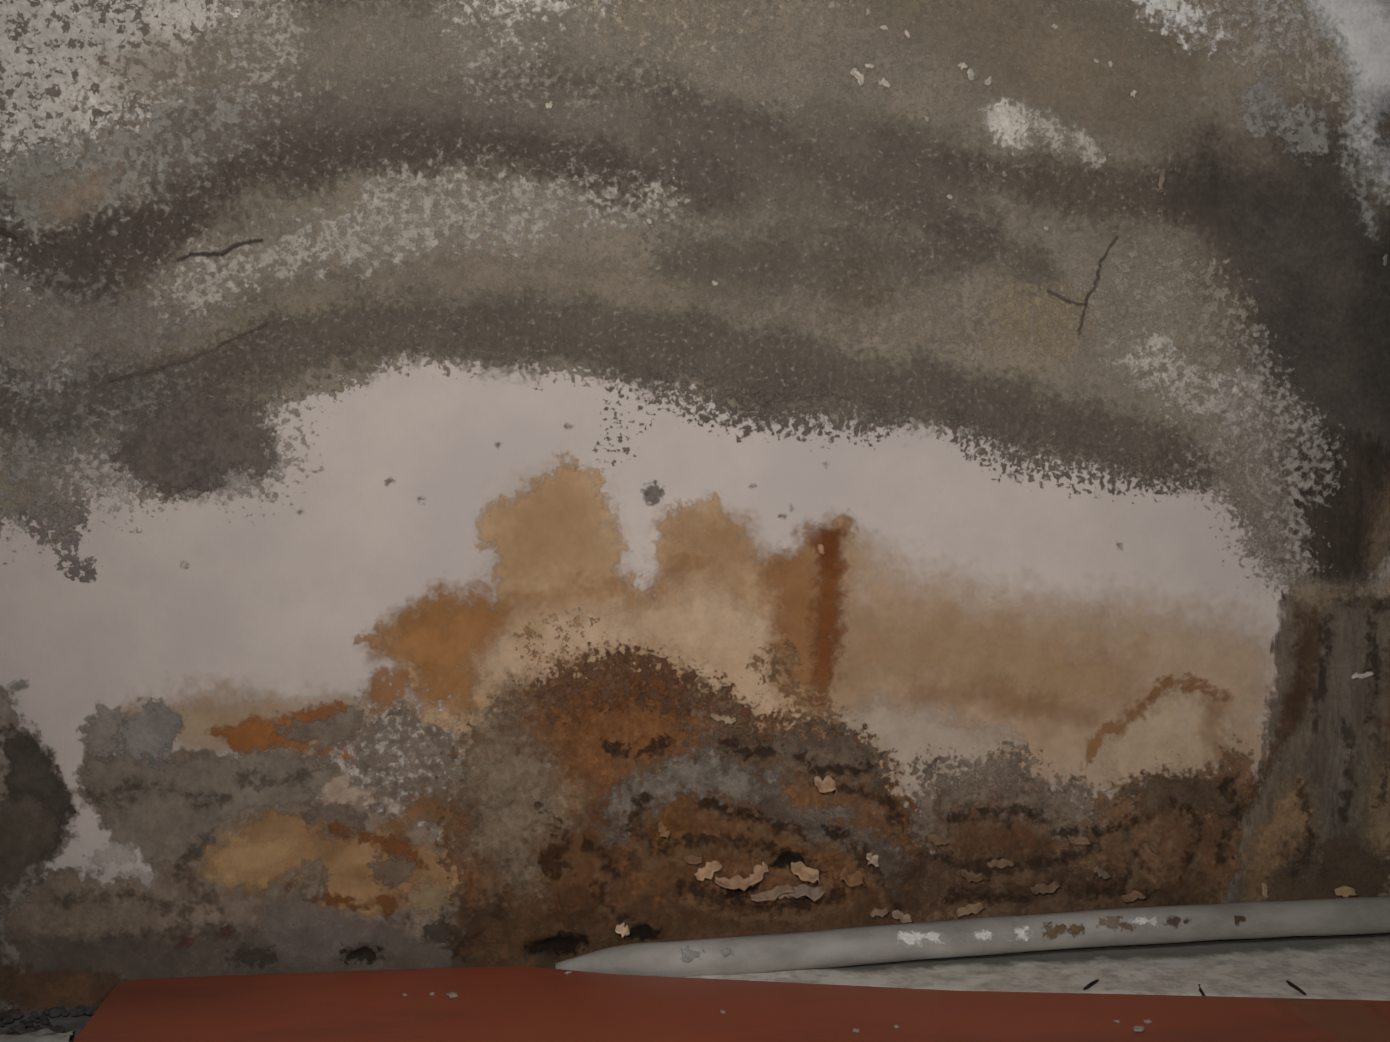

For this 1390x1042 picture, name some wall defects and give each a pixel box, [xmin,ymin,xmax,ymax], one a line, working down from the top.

crack [0,227,18,240]
crack [177,239,263,261]
crack [1047,236,1118,334]
crack [108,323,268,382]
damp [592,399,635,457]
damp [642,480,664,505]
rust [171,457,1270,798]
spalling [0,607,1262,1012]